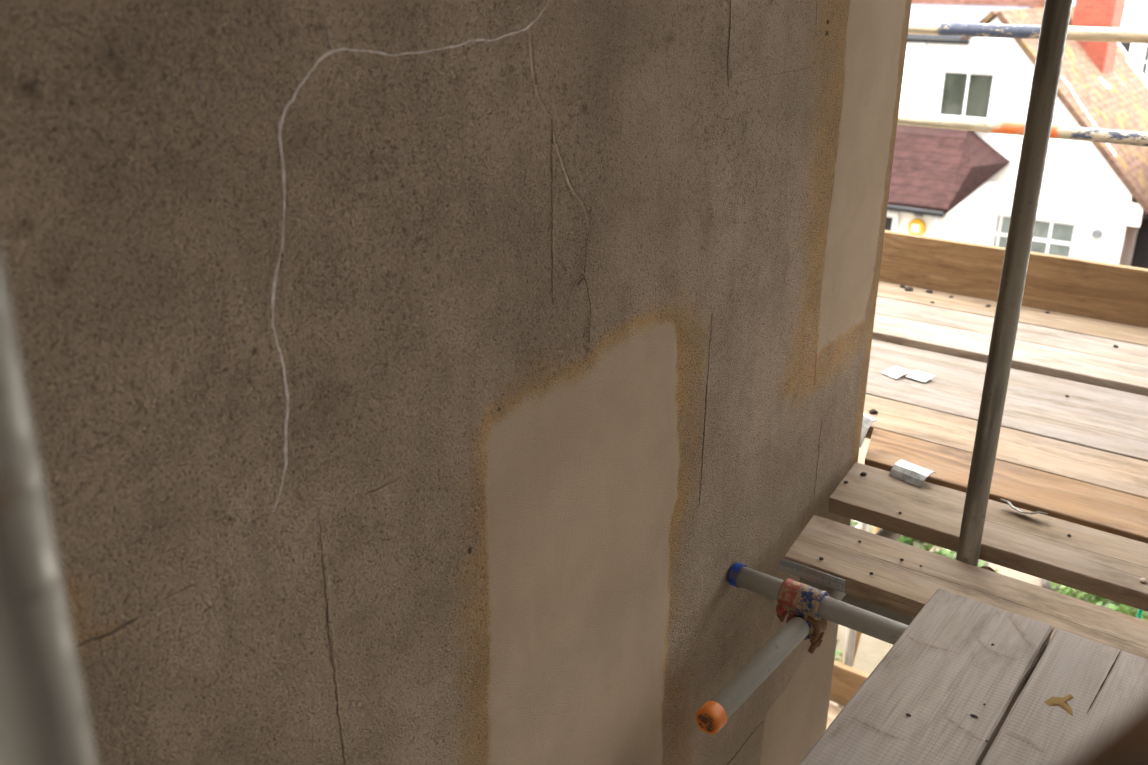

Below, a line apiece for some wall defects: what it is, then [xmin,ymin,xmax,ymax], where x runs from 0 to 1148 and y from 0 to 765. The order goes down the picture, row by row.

crack [728,0,810,88]
crack [266,0,591,519]
crack [699,315,713,506]
crack [319,520,347,765]